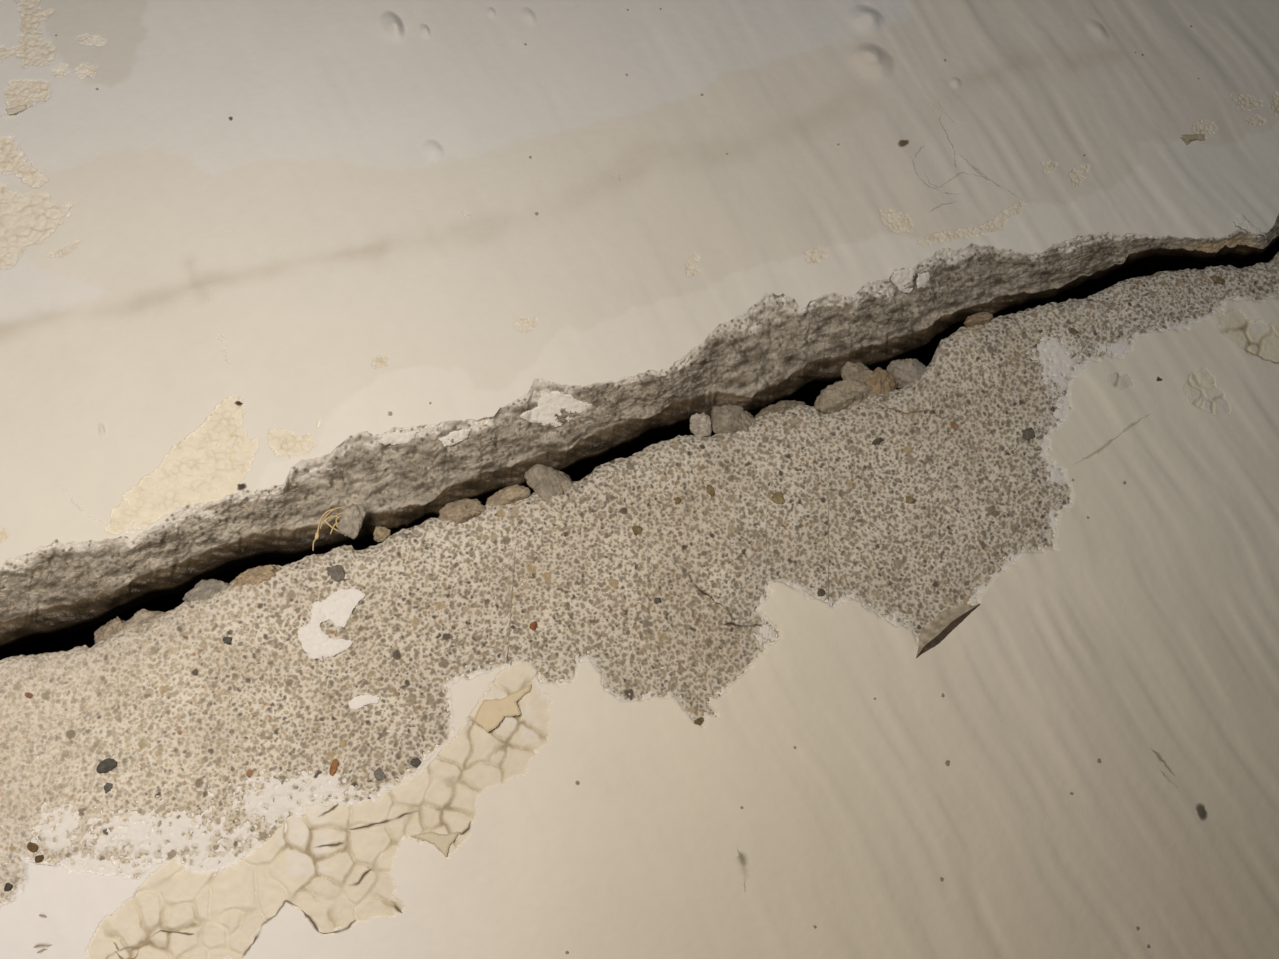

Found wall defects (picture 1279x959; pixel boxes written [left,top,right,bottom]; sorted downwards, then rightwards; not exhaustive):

peeling [5,0,97,115]
crack [0,214,1279,660]
spalling [0,251,1279,904]